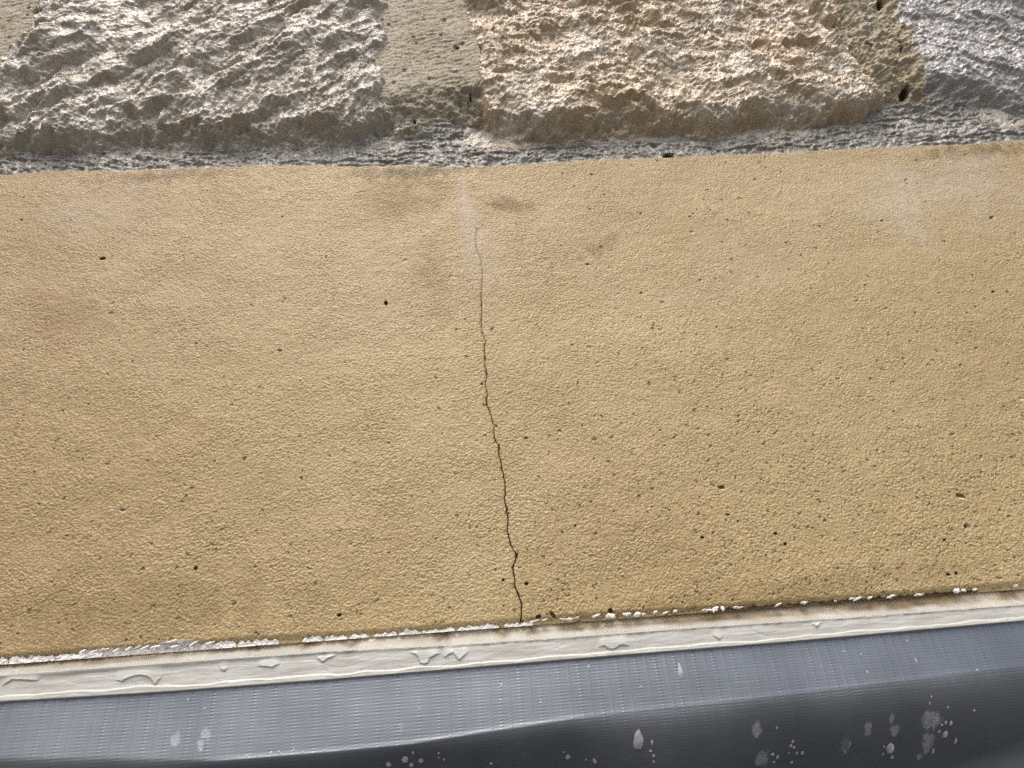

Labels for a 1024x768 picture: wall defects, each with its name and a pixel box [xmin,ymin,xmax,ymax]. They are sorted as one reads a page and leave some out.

crack [476,233,524,622]